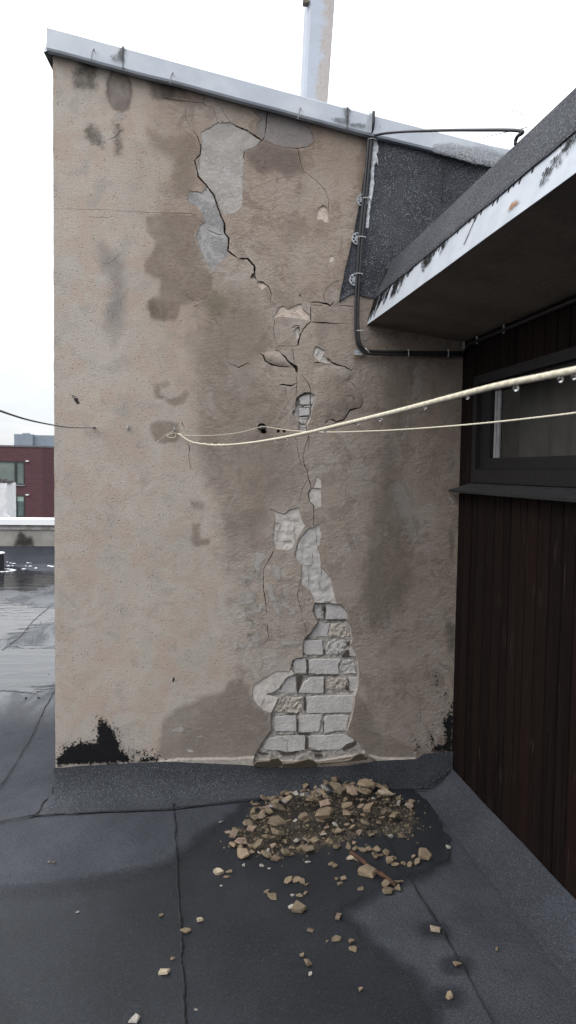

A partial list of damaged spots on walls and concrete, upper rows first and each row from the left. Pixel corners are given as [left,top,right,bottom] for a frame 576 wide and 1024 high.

leakage [75,62,96,88]
leakage [107,46,132,111]
peeling [187,122,261,271]
spalling [316,205,330,223]
crack [163,98,365,525]
spalling [272,294,310,340]
spalling [292,392,315,431]
spalling [308,476,322,508]
crack [263,551,274,644]
spalling [252,507,368,768]